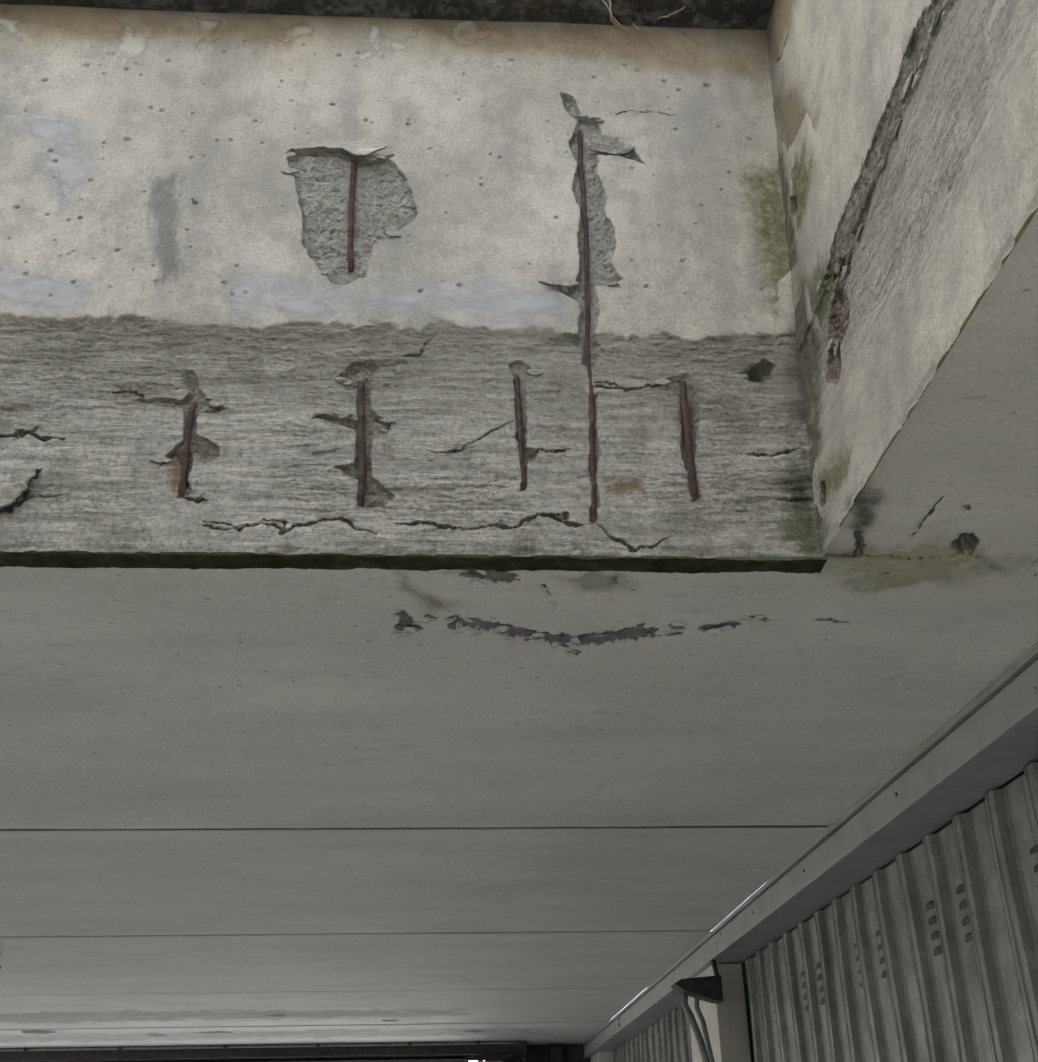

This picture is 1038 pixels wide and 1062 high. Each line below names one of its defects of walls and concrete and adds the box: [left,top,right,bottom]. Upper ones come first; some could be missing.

spalling [282,141,418,285]
spalling [816,0,957,385]
spalling [536,92,646,525]
peeling [0,457,38,509]
crack [0,470,63,514]
crack [0,428,66,442]
spalling [130,370,230,500]
crack [187,498,371,535]
spalling [311,358,397,508]
spalling [509,360,543,492]
crack [396,511,665,553]
peeling [390,609,685,656]